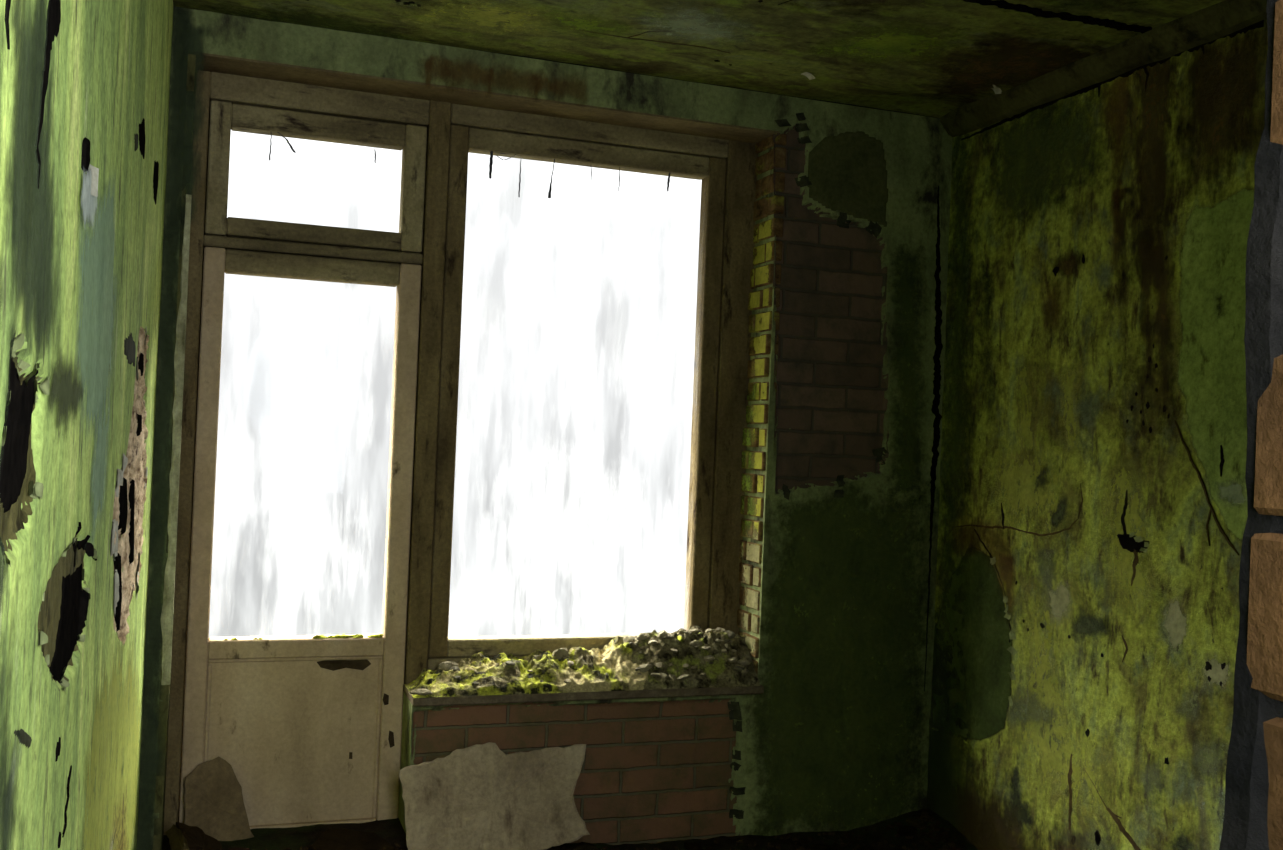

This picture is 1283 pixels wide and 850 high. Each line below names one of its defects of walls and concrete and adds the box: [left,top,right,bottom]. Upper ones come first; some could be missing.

leakage [425,58,584,98]
leakage [918,32,1106,99]
leakage [1115,19,1268,408]
spalling [0,332,84,568]
flaking render [37,326,149,691]
leakage [927,84,1110,850]
leakage [1103,457,1151,619]
spalling [1117,490,1149,586]
crack [1174,421,1239,555]
crack [1068,754,1141,850]
leakage [1171,833,1193,850]